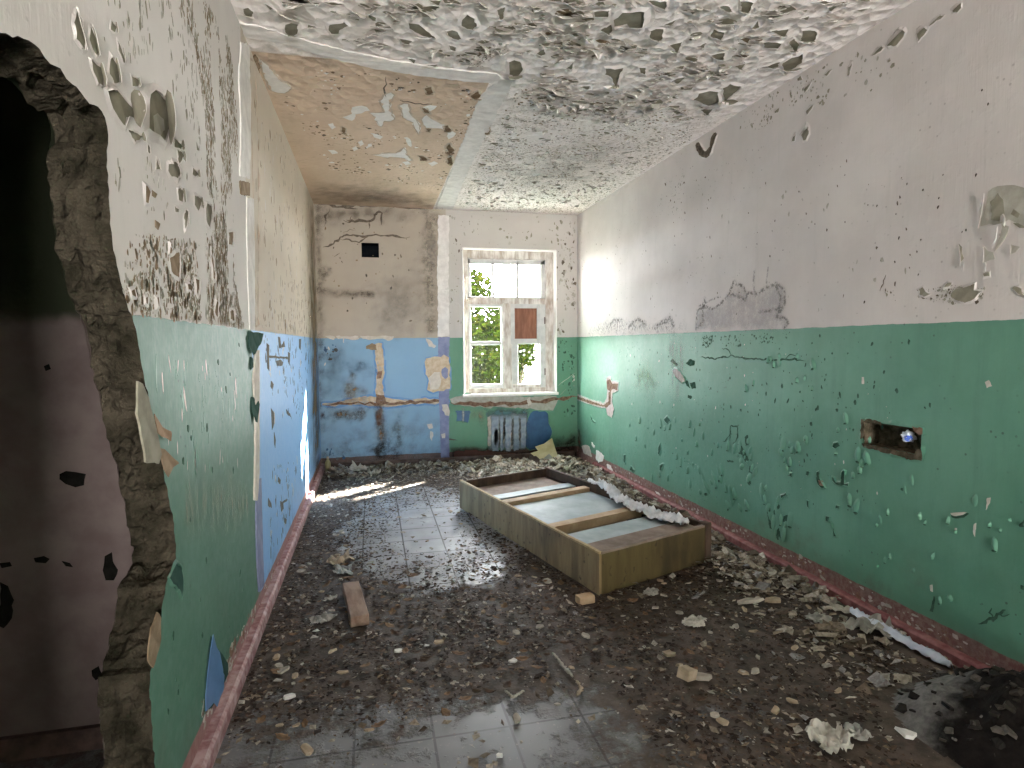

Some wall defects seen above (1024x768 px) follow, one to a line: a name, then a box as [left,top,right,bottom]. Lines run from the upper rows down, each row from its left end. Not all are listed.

crack [318,204,422,257]
peeling [241,0,963,451]
peeling [852,185,1024,305]
water stain [696,272,789,329]
crack [702,348,803,361]
spalling [0,0,312,768]
water stain [334,409,365,420]
spalling [789,406,926,509]
peeling [951,512,976,536]